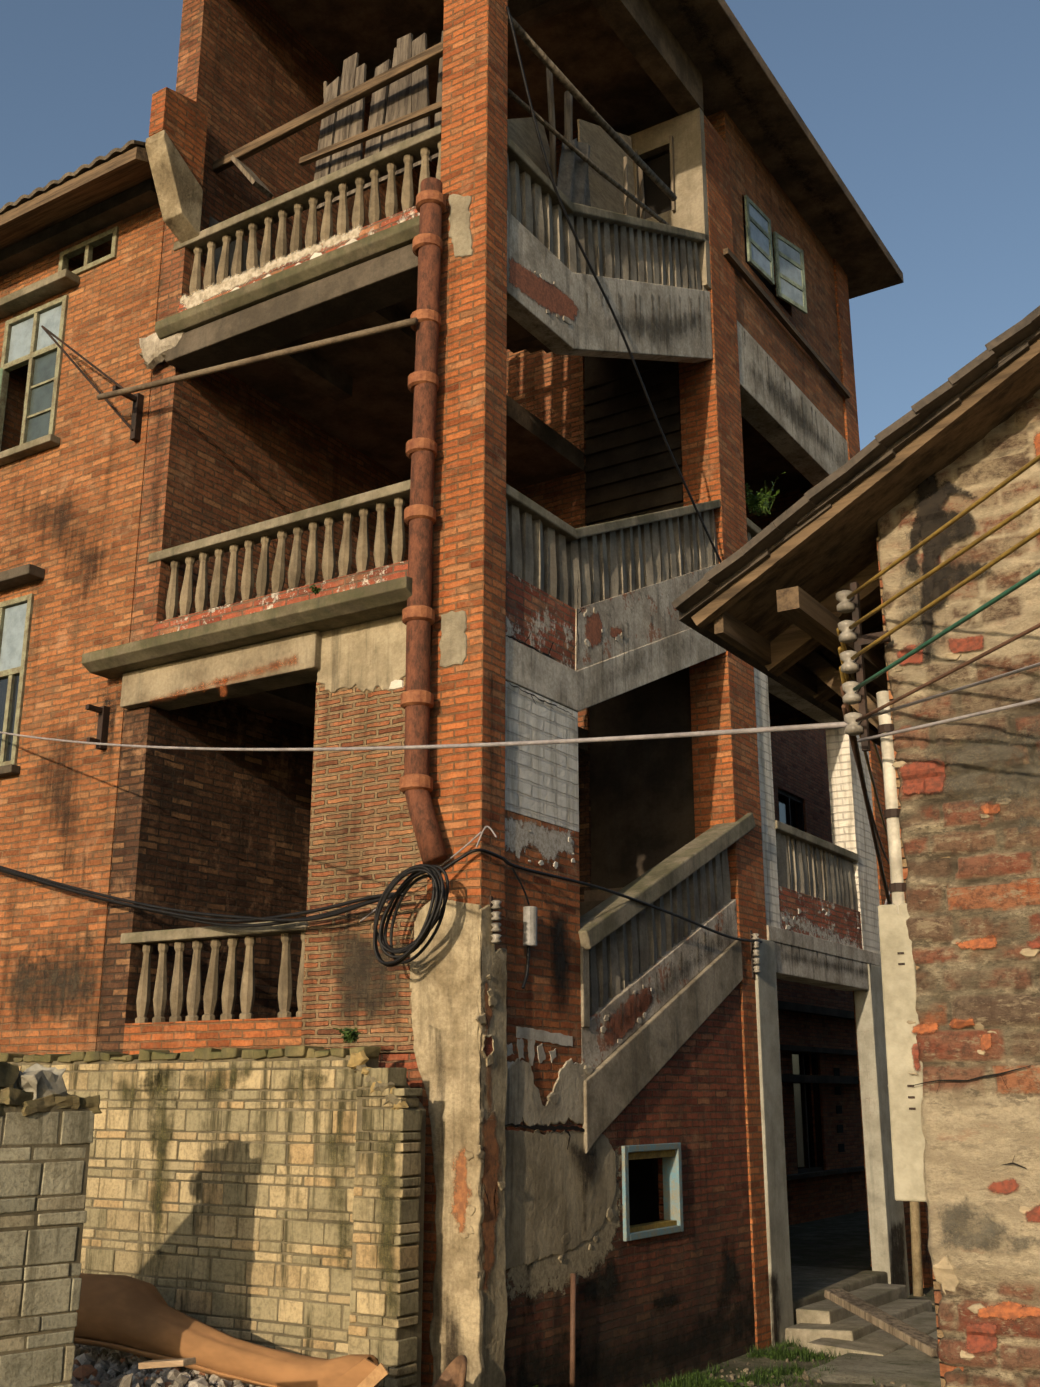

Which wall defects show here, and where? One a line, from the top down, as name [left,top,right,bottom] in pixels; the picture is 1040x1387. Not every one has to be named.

peeling [509,258,579,325]
leakage [943,481,977,498]
leakage [906,517,936,663]
peeling [583,608,623,648]
peeling [505,817,575,869]
spalling [960,1301,1040,1359]